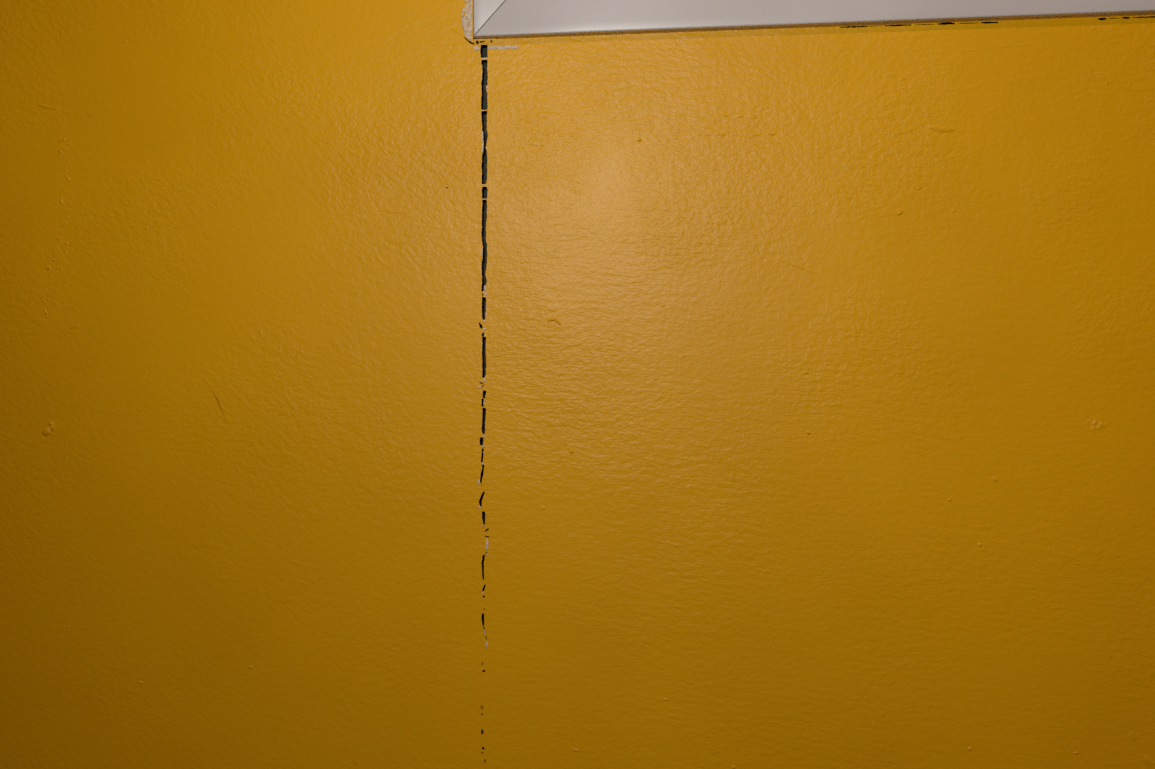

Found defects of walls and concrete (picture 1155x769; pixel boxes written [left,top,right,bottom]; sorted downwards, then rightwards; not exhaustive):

crack [464,37,492,672]